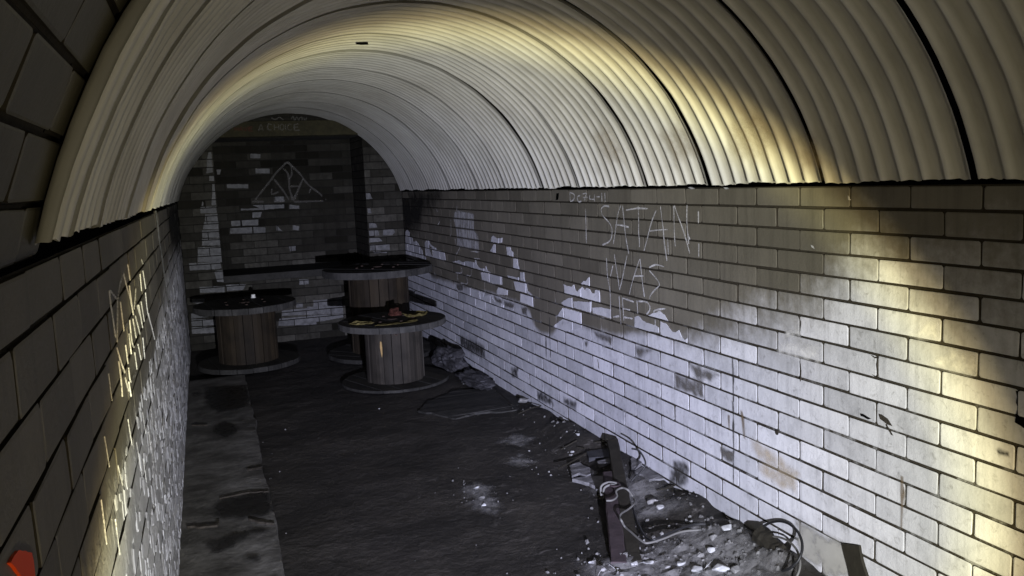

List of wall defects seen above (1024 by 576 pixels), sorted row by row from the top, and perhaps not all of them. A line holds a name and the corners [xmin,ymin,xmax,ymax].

peeling [366,193,533,316]
peeling [278,298,343,326]
peeling [554,277,611,331]
peeling [634,311,687,343]
peeling [114,152,299,576]